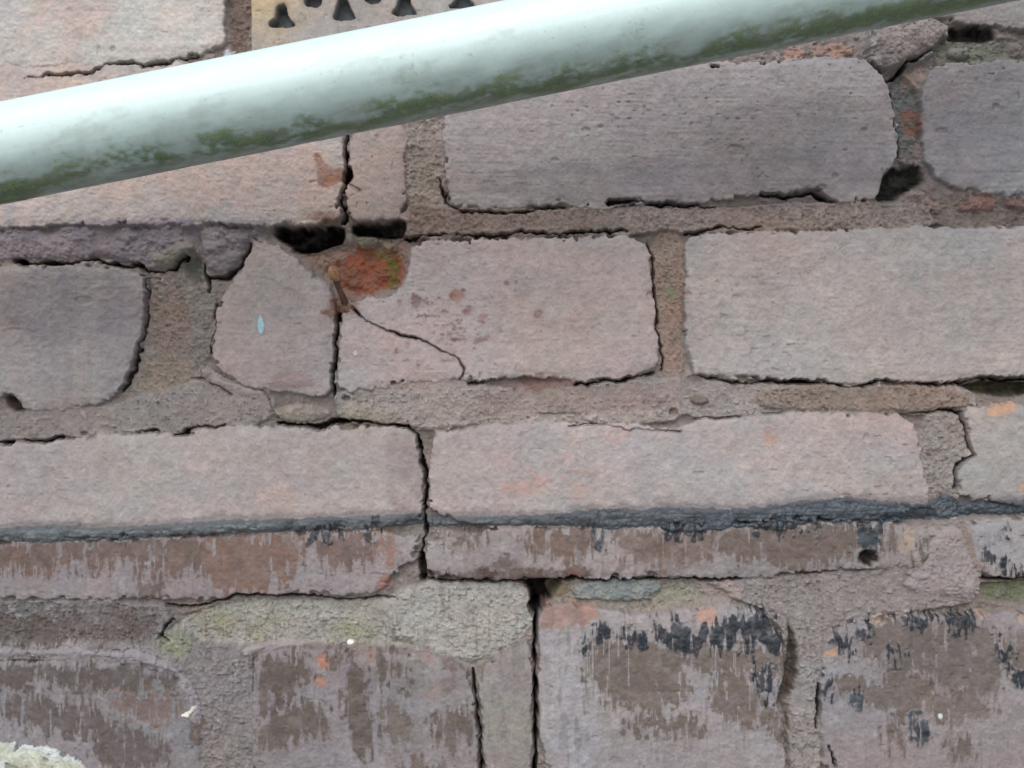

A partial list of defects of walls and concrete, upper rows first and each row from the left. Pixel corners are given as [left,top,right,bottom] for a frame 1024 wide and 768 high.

crack [337,135,362,225]
corrosion [325,285,366,319]
crack [258,305,466,583]
peeling [0,526,402,768]
crack [472,667,485,768]
crack [528,593,539,768]
leakage [576,618,650,666]
peeling [427,519,931,747]
leakage [742,656,780,711]
peeling [828,606,1024,766]